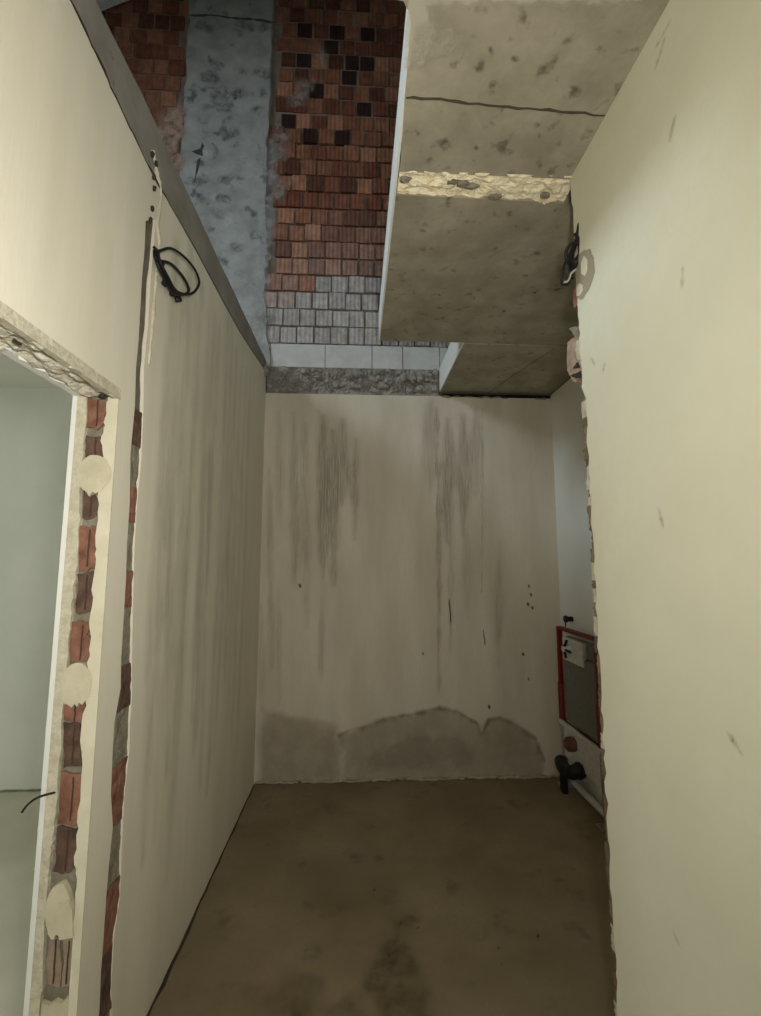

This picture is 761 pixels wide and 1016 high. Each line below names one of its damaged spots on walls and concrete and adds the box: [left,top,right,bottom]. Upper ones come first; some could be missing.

crack [406,96,605,117]